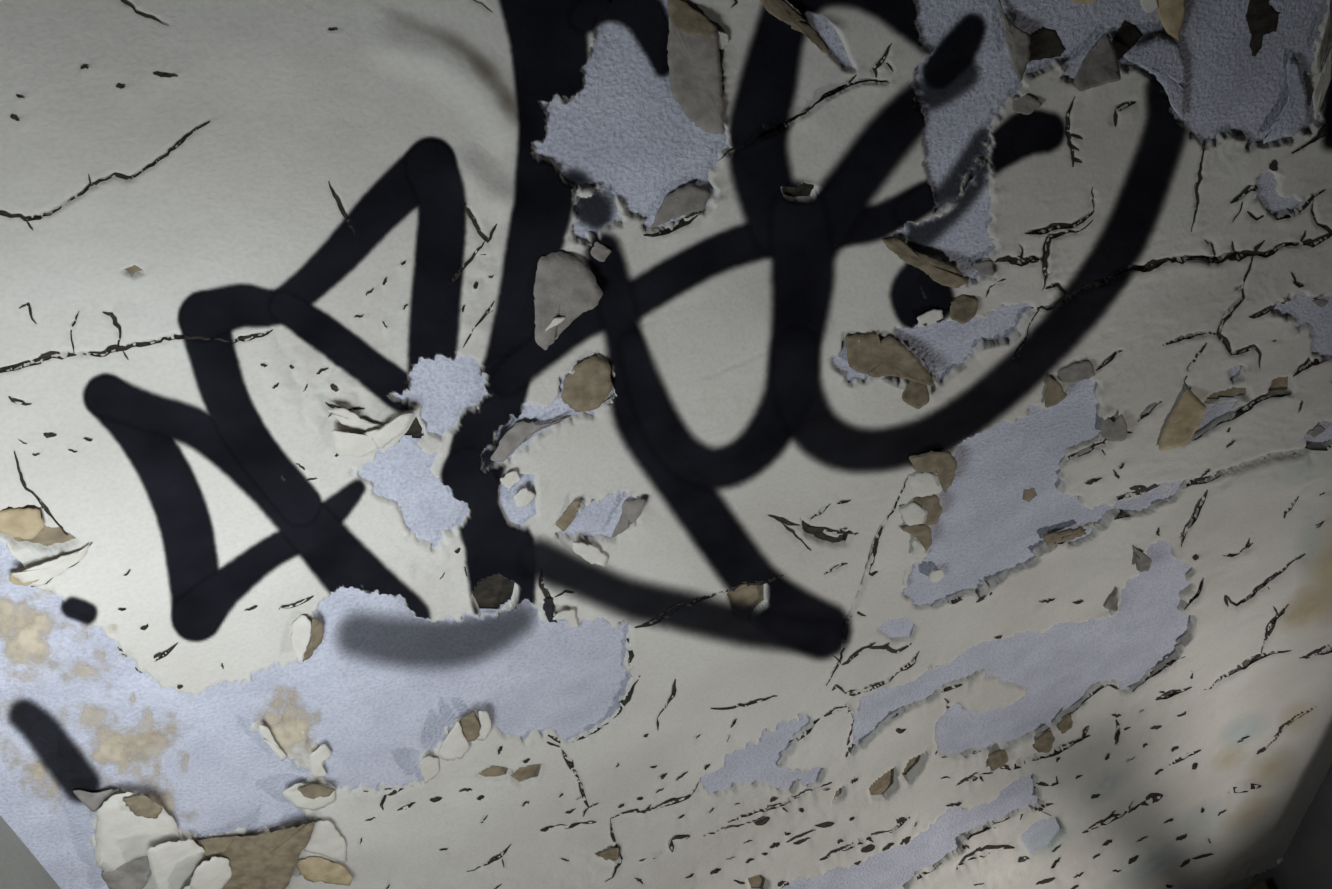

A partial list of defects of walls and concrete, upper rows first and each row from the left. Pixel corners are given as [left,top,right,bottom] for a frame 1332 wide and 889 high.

crack [121,0,169,26]
crack [14,451,93,587]
crack [0,121,210,230]
crack [0,304,273,406]
peeling [328,354,488,548]
peeling [481,355,612,526]
peeling [531,0,729,350]
peeling [876,361,1210,638]
peeling [831,0,1332,409]
crack [986,97,1332,463]
crack [1115,447,1307,547]
peeling [0,505,632,889]